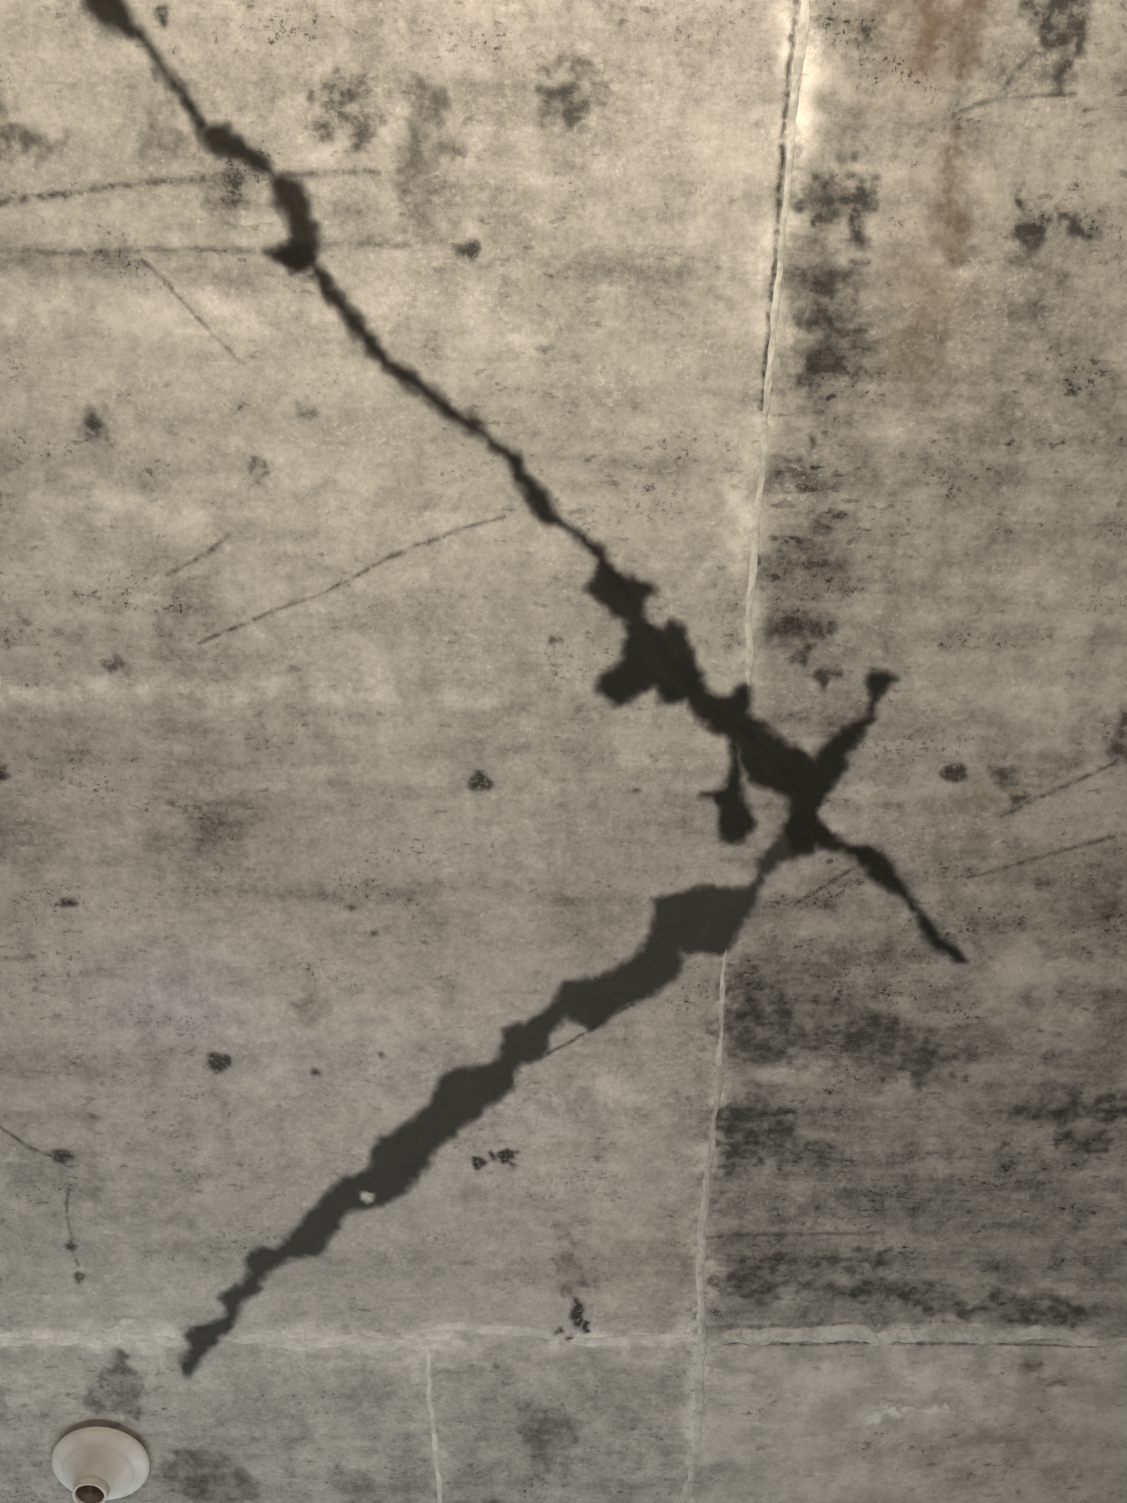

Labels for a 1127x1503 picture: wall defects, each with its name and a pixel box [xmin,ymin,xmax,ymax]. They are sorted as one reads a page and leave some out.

leakage [1021,0,1089,80]
crack [761,2,795,403]
leakage [1013,199,1094,249]
leakage [85,0,965,1376]
leakage [1108,713,1127,758]
leakage [1016,1094,1127,1153]
leakage [954,1290,1085,1323]